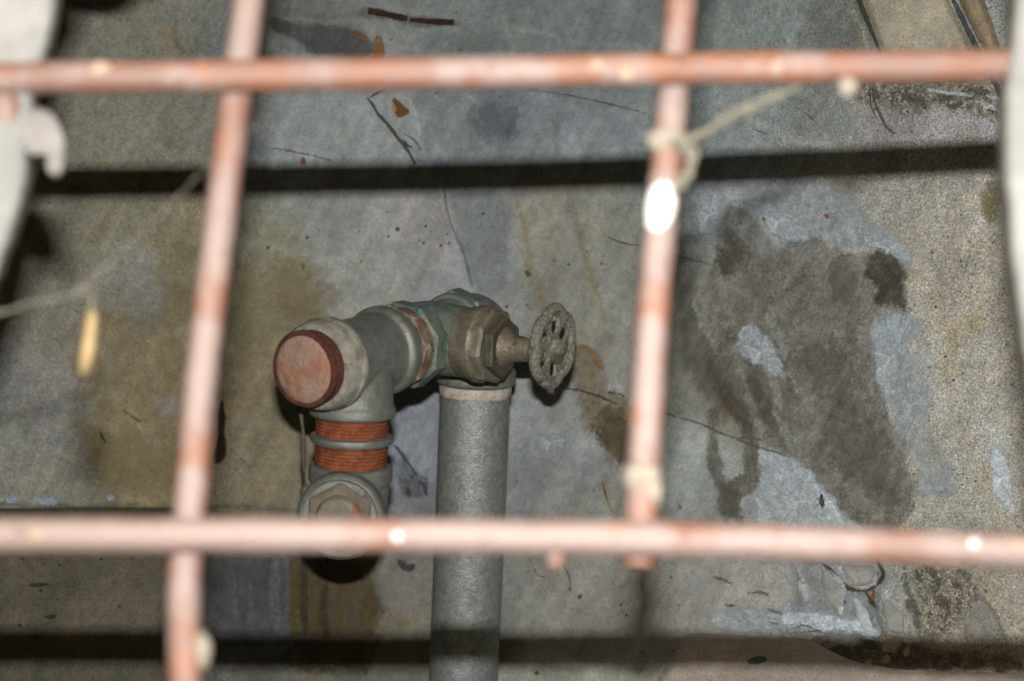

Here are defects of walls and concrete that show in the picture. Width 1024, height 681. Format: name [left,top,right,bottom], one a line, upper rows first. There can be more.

rust [359,7,458,27]
crack [367,90,421,164]
rust [392,98,409,117]
damp [684,180,955,528]
crack [664,412,789,458]